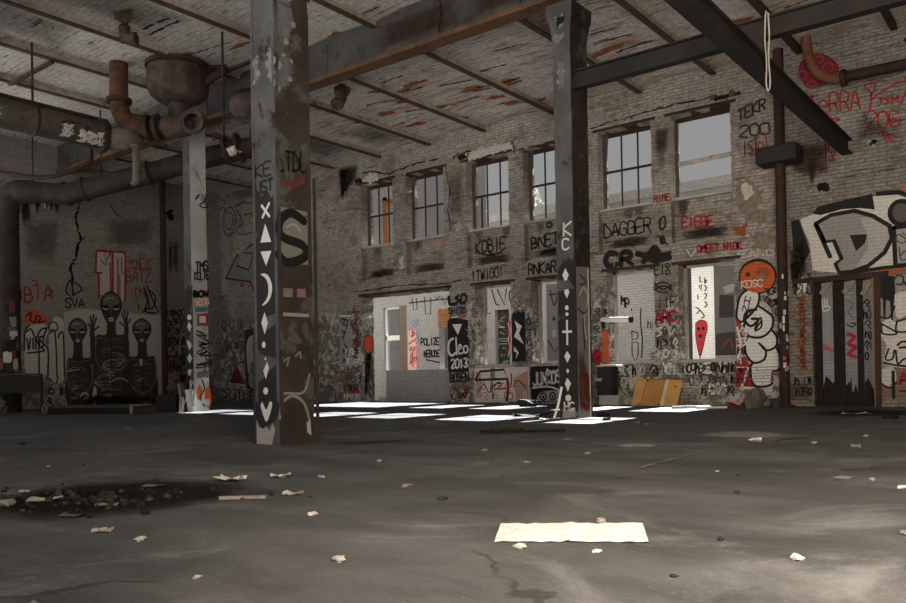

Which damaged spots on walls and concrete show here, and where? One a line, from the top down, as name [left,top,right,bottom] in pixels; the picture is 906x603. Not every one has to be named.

corrosion [386,6,447,44]
peeling [252,0,295,92]
corrosion [592,43,624,58]
corrosion [462,78,524,105]
crack [68,203,88,281]